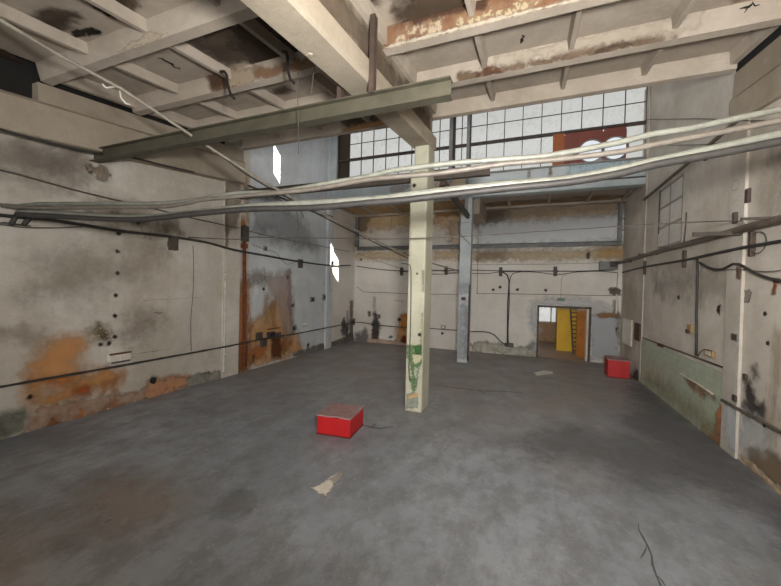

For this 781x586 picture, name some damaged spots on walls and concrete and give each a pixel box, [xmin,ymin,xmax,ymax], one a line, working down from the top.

water stain [35,8,81,31]
water stain [391,0,465,23]
spalling [384,0,580,49]
corrosion [29,337,125,406]
flaking render [23,273,226,433]
corrosion [238,279,302,373]
flaking render [739,452,781,495]
crack [638,524,666,586]